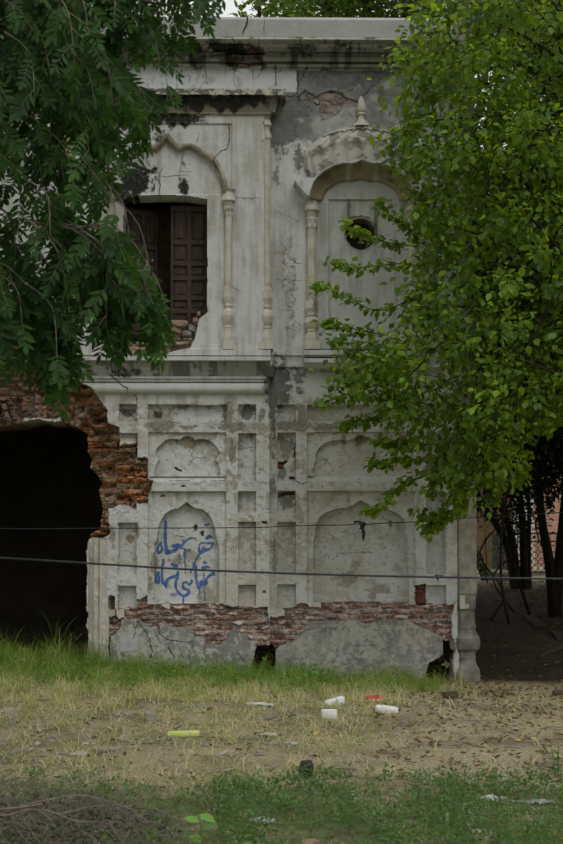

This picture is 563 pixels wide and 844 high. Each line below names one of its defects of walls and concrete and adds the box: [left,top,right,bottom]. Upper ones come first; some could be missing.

water stain [181,43,275,70]
spalling [299,90,358,122]
crack [155,124,230,195]
flaking render [120,436,136,445]
spalling [109,584,469,659]